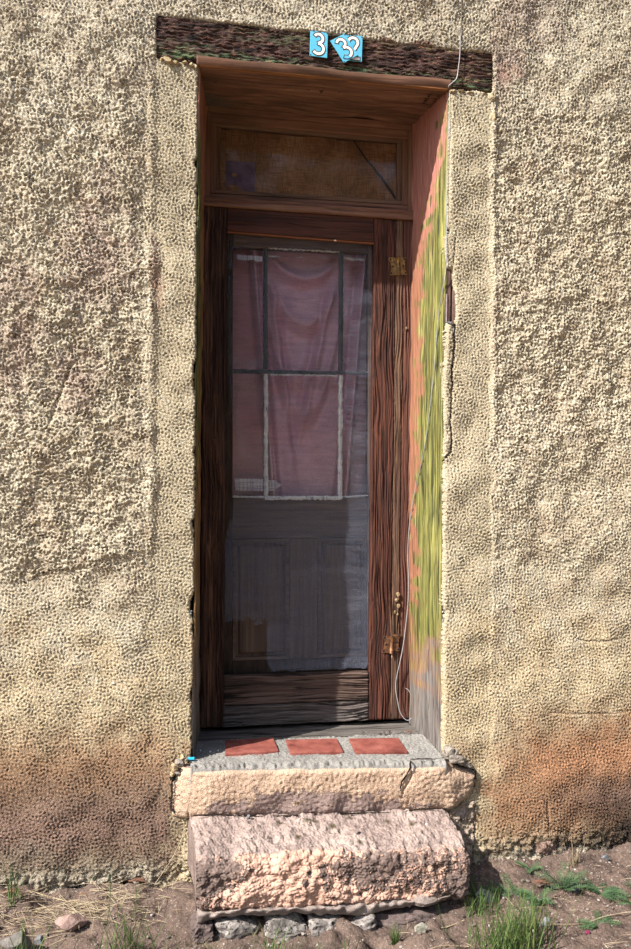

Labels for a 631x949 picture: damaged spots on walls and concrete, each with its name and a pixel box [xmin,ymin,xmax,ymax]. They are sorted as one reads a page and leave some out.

crack [442,323,463,462]
leakage [0,744,176,892]
peeling [169,745,476,912]
crack [170,757,476,820]
leakage [482,714,631,862]